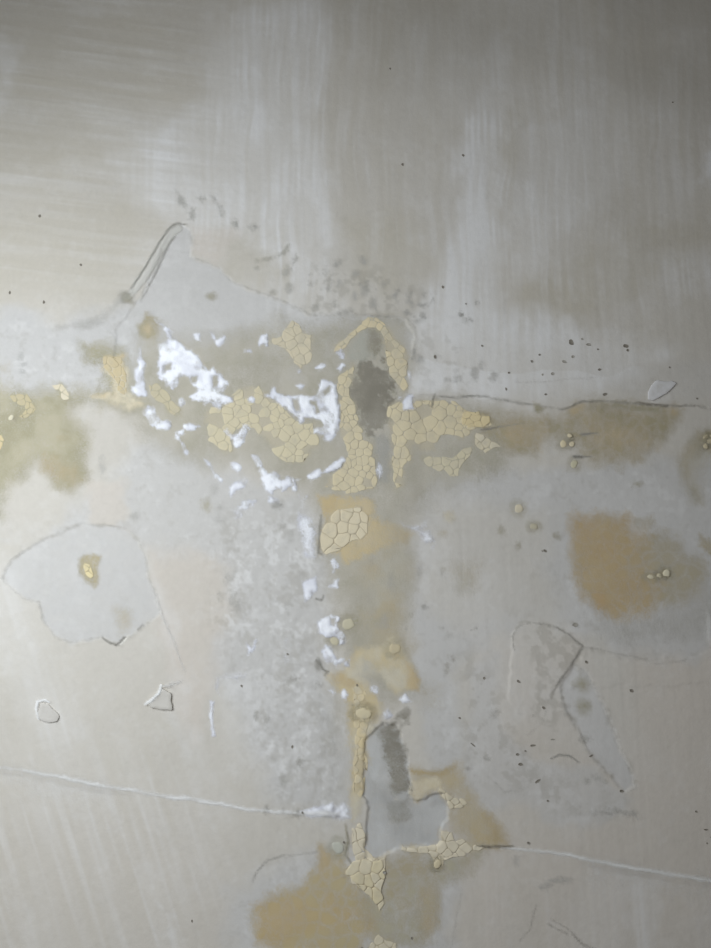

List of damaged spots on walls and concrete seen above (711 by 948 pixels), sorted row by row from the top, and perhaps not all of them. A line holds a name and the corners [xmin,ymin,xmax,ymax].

peeling [268,320,314,371]
peeling [203,384,320,464]
peeling [324,362,379,495]
peeling [333,317,503,493]
crack [429,393,708,432]
water stain [0,255,520,822]
peeling [319,505,371,556]
crack [0,765,352,864]
peeling [342,822,389,911]
peeling [399,829,485,869]
crack [478,844,711,905]